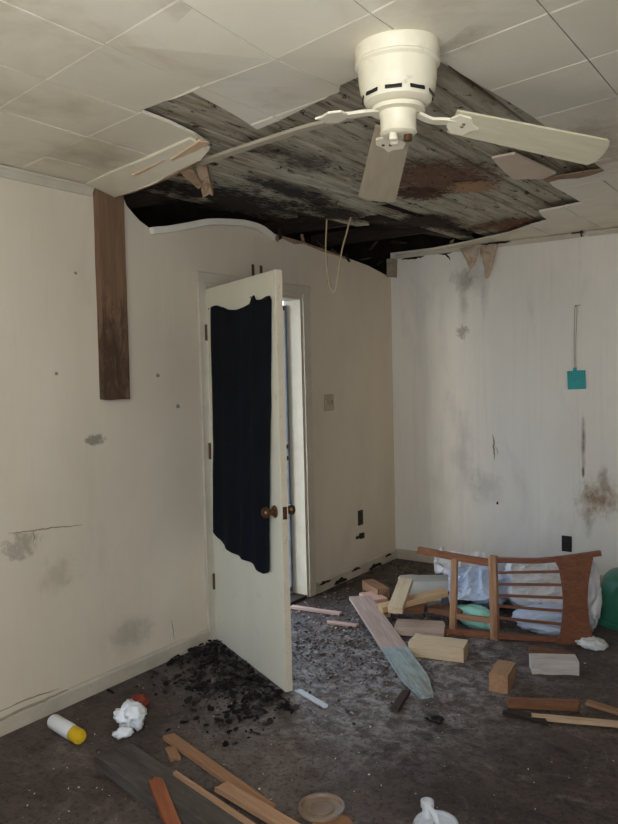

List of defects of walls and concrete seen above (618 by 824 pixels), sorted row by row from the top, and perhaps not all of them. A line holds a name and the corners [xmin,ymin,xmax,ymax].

crack [15,525,79,542]